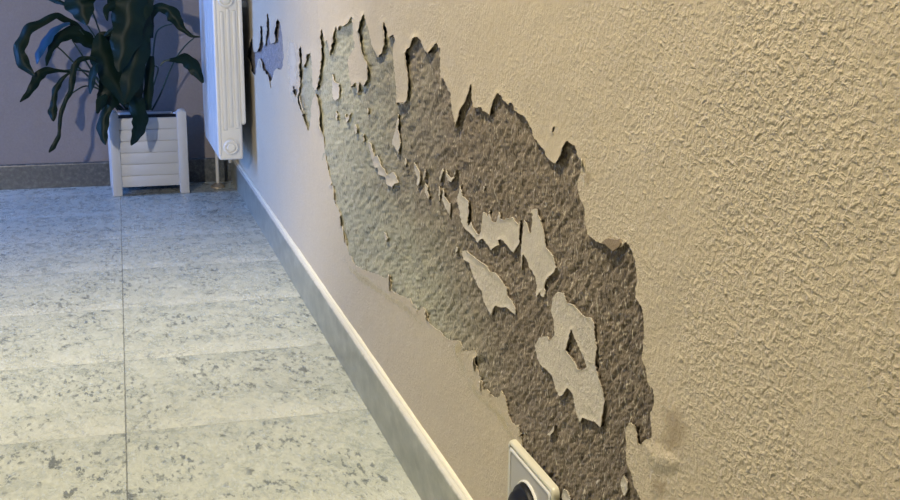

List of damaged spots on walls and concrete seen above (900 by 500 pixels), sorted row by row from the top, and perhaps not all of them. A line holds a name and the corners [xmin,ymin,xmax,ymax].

peeling [248,15,284,88]
peeling [293,15,654,500]